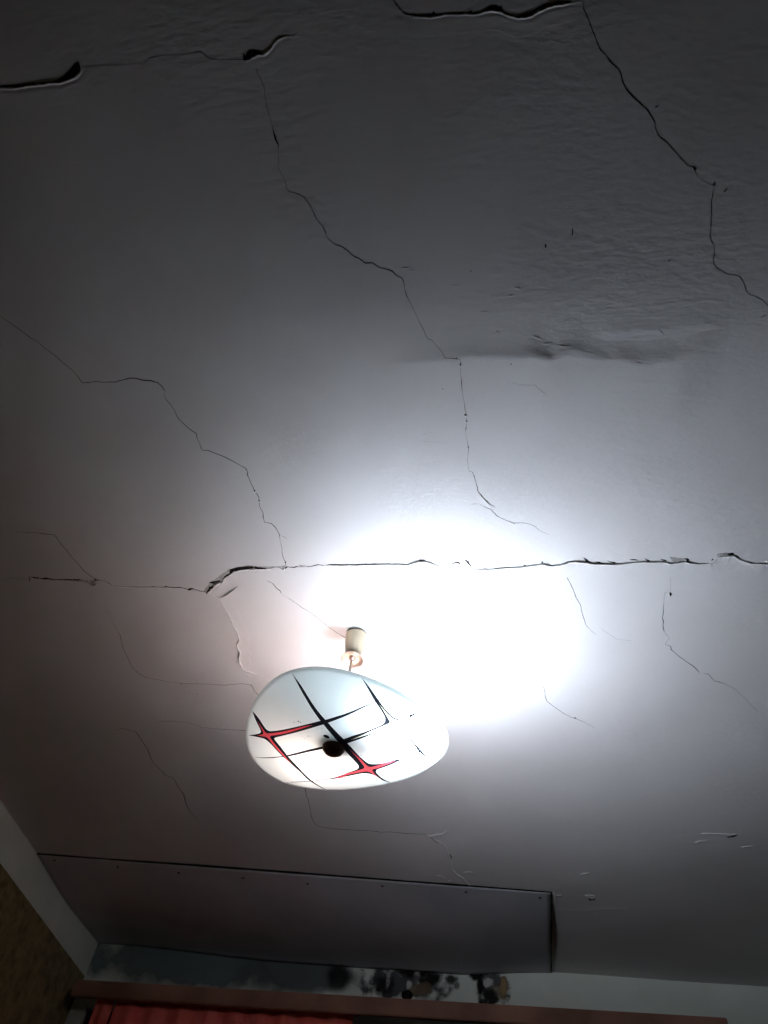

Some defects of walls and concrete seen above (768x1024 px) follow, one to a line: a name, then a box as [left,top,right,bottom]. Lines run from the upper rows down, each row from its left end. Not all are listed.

spalling [0,62,95,109]
spalling [243,35,303,81]
spalling [393,0,582,38]
crack [582,2,768,306]
crack [106,52,549,535]
crack [0,316,768,709]
spalling [203,565,290,684]